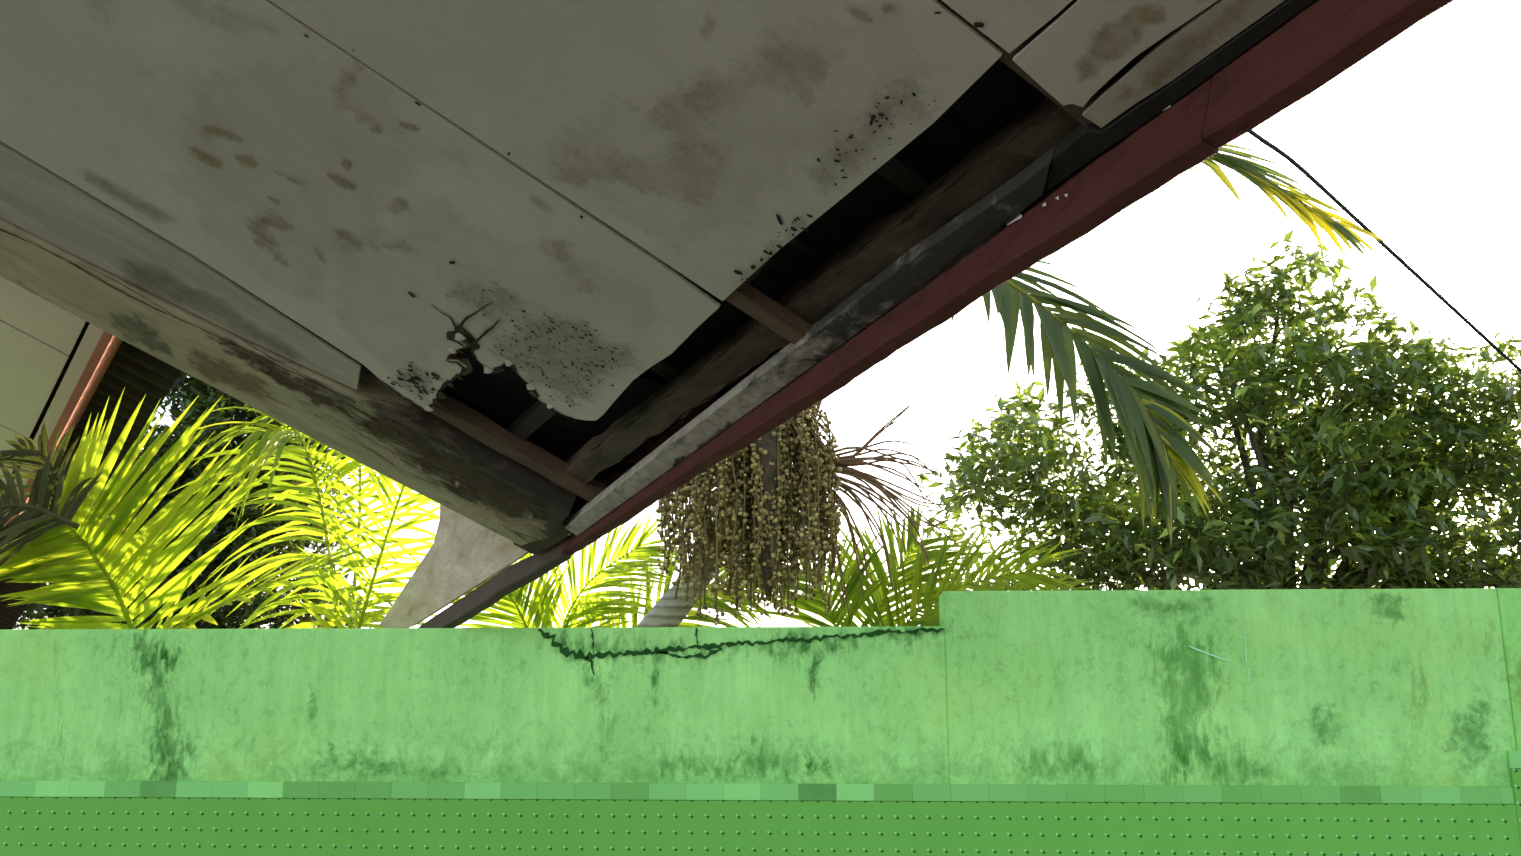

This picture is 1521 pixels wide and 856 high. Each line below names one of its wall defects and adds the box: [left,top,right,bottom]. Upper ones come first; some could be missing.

damp [817,87,936,186]
damp [447,284,632,407]
crack [538,627,944,675]